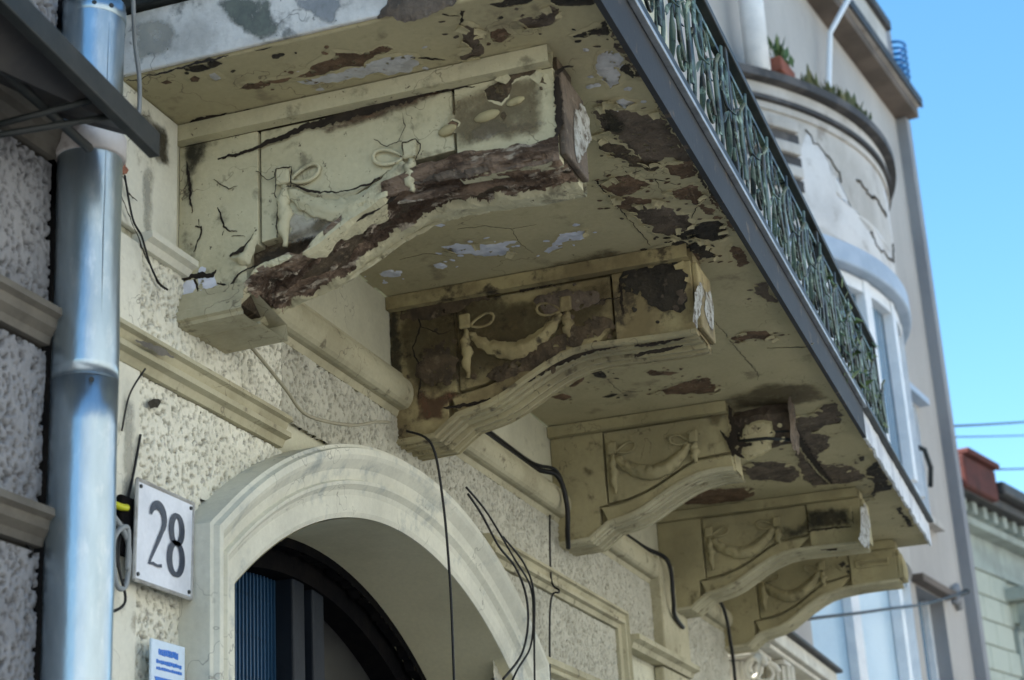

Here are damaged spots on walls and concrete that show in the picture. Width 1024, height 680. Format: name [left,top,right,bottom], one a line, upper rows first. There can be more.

spalling [377,0,595,63]
spalling [158,43,428,91]
leakage [452,82,538,141]
crack [122,86,475,291]
spalling [243,20,751,331]
spalling [471,283,616,383]
spalling [727,329,789,345]
spalling [551,370,619,403]
spalling [643,367,726,398]
spalling [684,400,893,548]